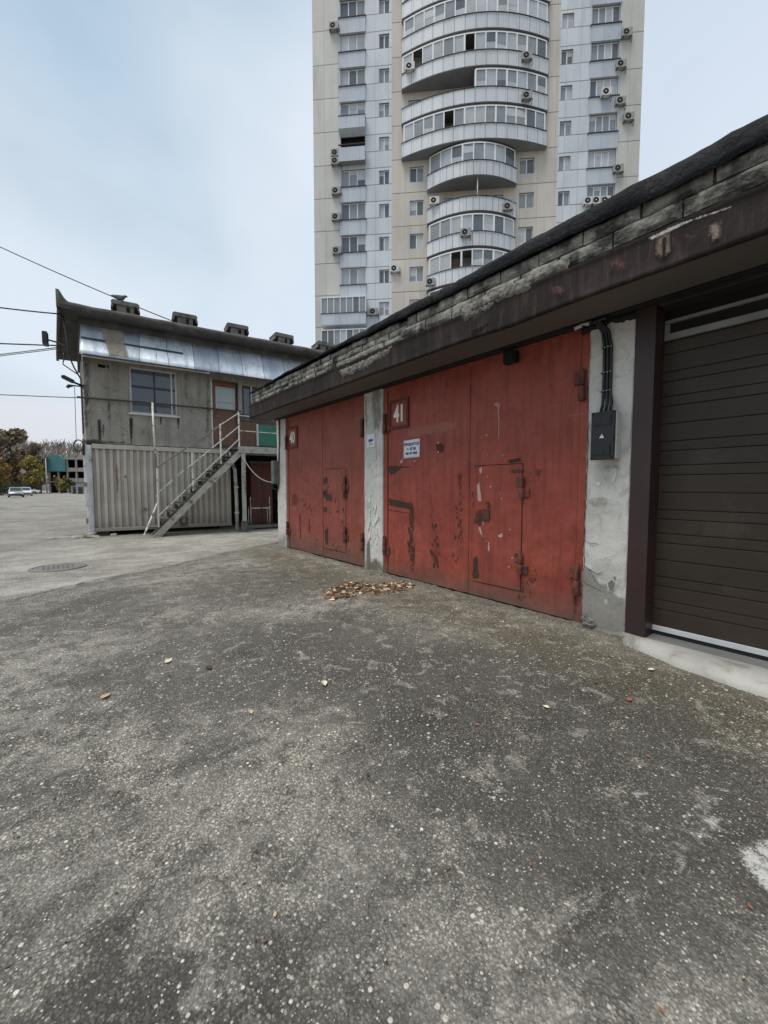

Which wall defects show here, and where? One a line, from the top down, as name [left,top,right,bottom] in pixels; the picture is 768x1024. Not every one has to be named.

rust [388,499,414,524]